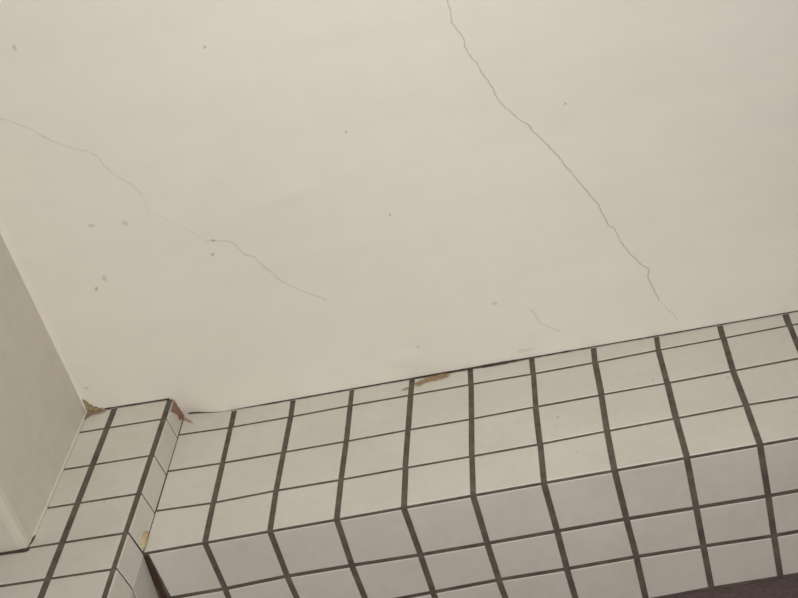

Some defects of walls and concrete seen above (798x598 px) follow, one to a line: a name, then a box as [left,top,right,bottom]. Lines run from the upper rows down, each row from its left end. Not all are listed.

spalling [82,399,106,420]